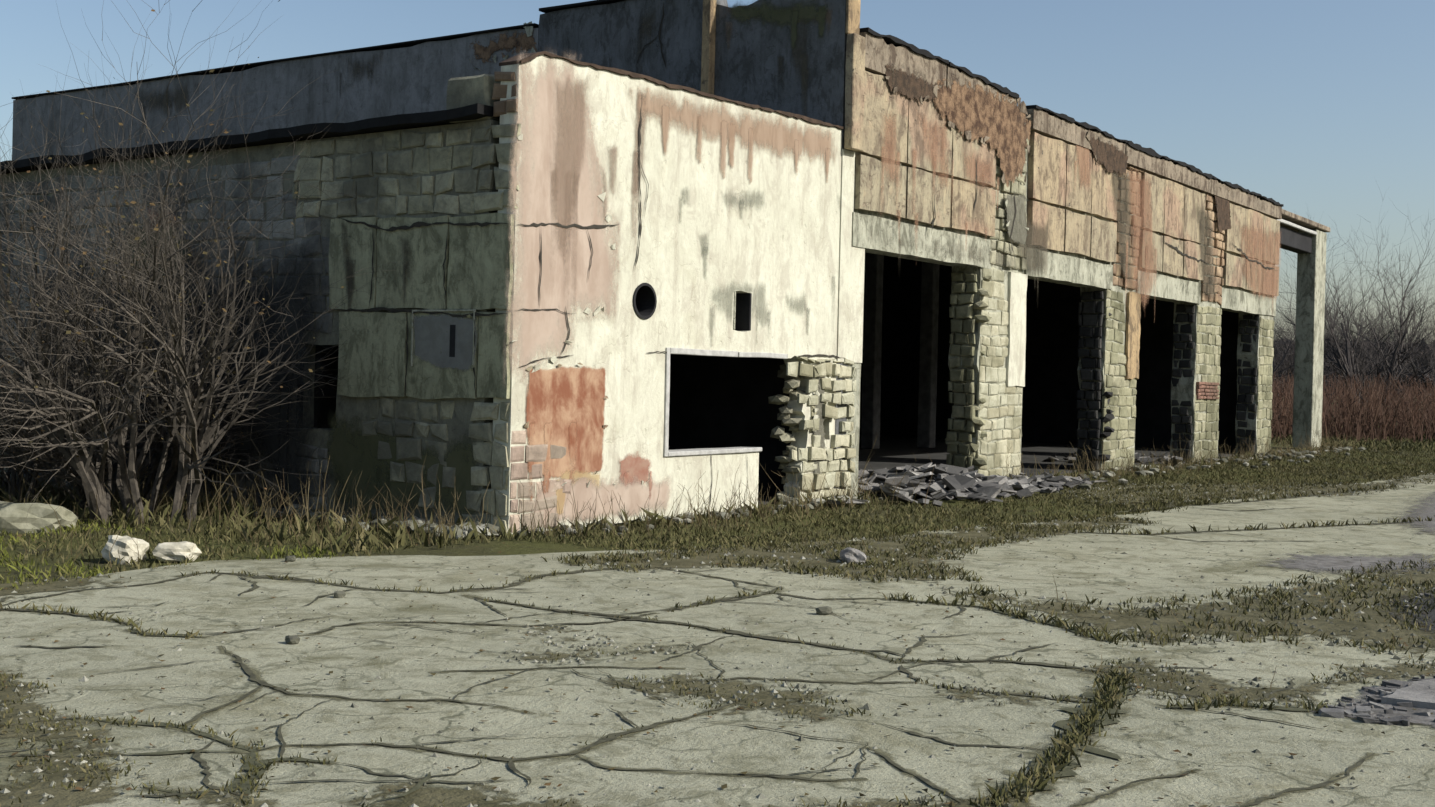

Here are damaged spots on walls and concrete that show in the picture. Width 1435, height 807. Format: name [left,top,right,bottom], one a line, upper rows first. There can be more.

crack [637,3,666,67]
crack [334,105,649,396]
peeling [469,21,619,373]
rust [638,88,831,183]
spalling [885,64,1032,245]
spalling [1086,130,1129,177]
rust [1126,174,1157,305]
crack [799,352,846,360]
spalling [786,357,857,499]
peeling [534,478,670,525]
crack [0,566,1320,807]
crack [1235,752,1379,807]